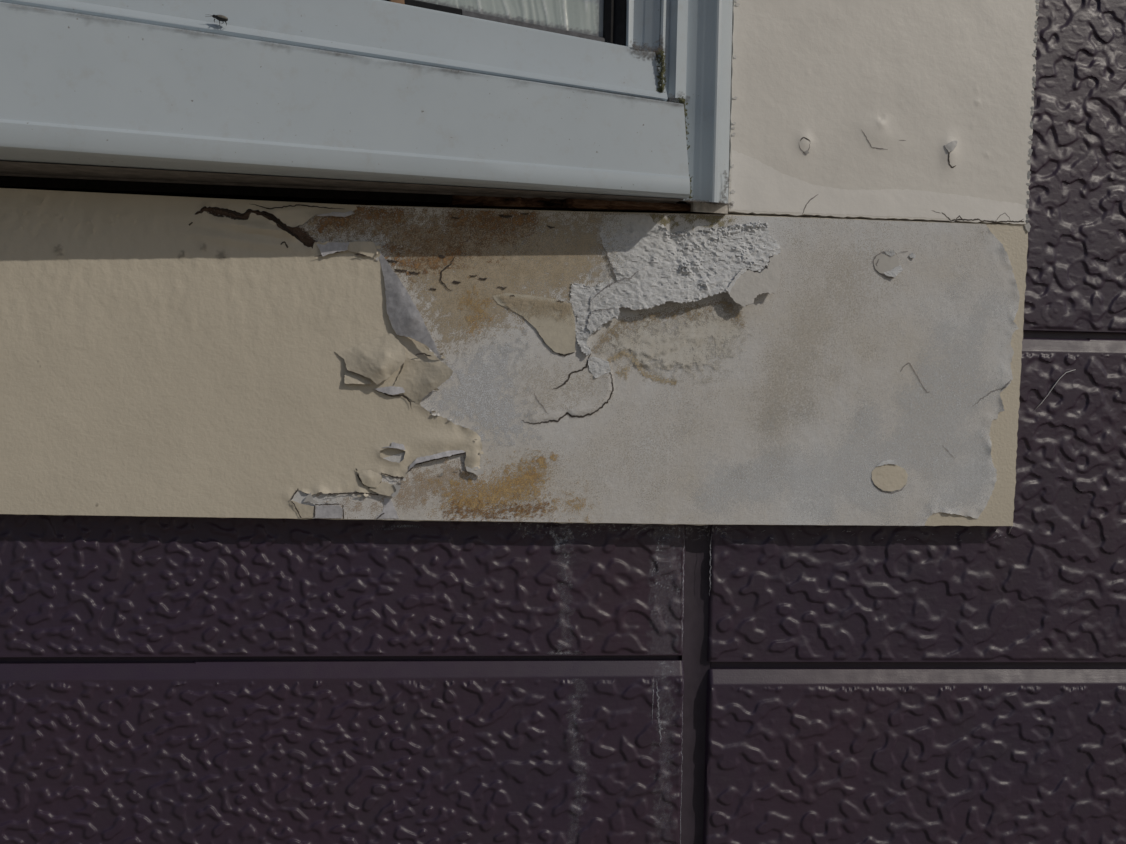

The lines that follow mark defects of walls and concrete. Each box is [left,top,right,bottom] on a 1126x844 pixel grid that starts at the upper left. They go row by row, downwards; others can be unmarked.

corrosion [304,206,539,334]
peeling [292,206,1020,526]
corrosion [317,450,601,524]